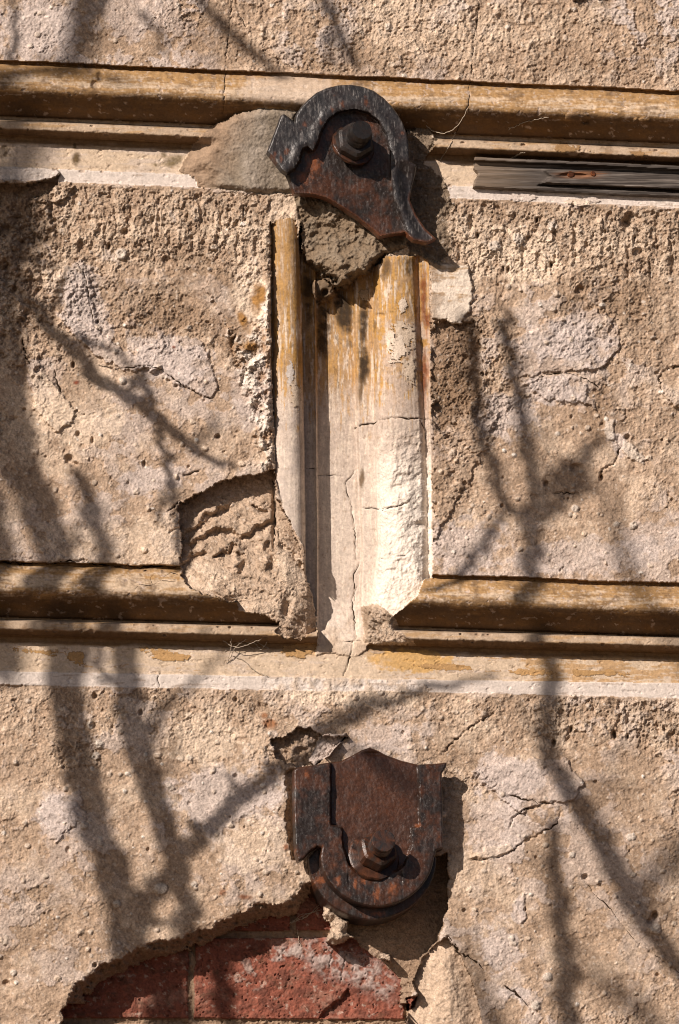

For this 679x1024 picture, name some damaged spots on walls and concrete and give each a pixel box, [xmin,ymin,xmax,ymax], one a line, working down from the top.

flaking render [406,129,483,438]
crack [355,417,429,429]
flaking render [178,470,317,658]
crack [309,468,405,676]
peeling [13,647,86,666]
peeling [139,646,190,661]
flaking render [271,728,347,767]
crack [474,795,559,861]
flaking render [62,854,451,1024]